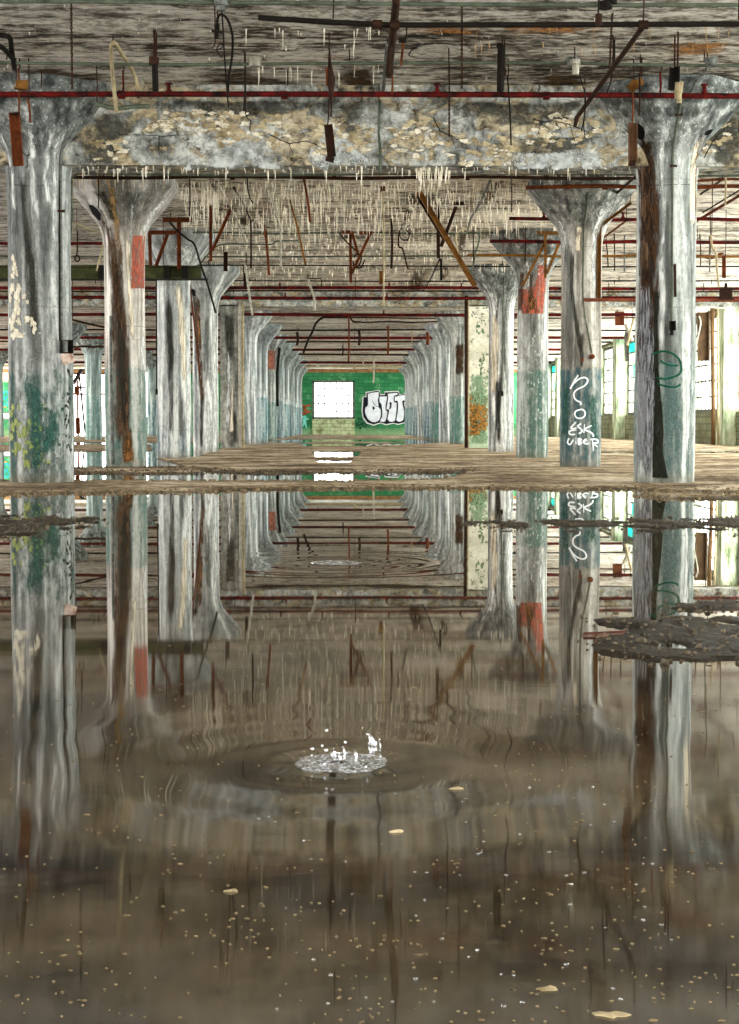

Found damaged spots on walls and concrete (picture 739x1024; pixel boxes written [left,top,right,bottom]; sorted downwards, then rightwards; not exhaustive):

peeling [88,136,130,161]
peeling [142,109,291,151]
peeling [310,112,605,167]
damp [710,108,739,165]
rust [637,139,661,369]
peeling [9,254,41,340]
rust [99,187,134,463]
rust [518,272,534,311]